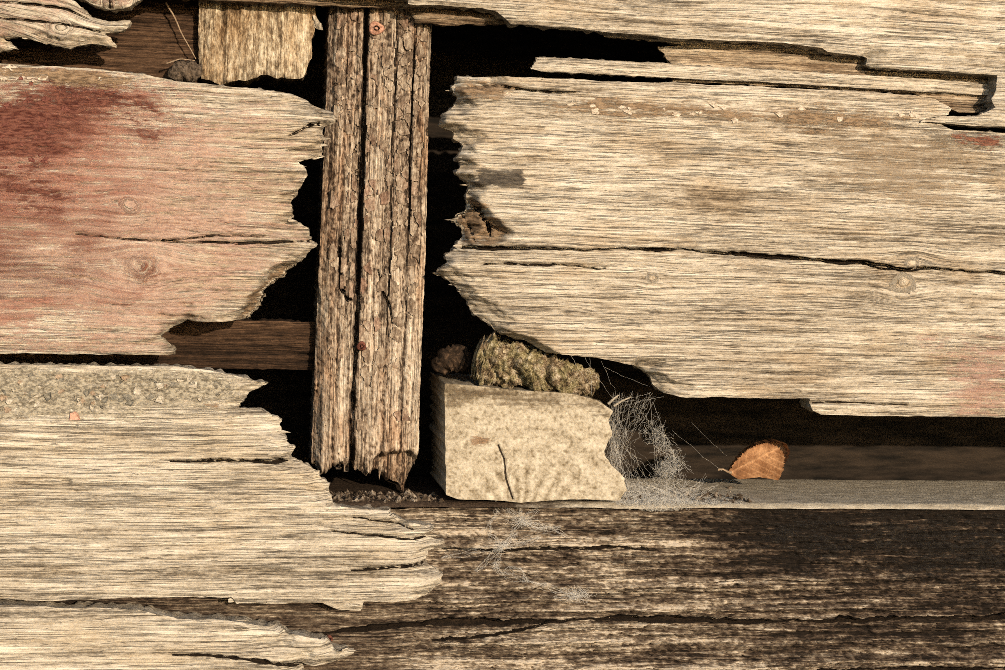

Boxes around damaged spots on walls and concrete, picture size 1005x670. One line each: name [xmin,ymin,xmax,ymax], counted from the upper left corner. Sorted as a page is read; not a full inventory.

crack [0,0,111,32]
peeling [0,65,161,221]
crack [79,233,310,245]
crack [462,199,1005,275]
crack [170,457,288,465]